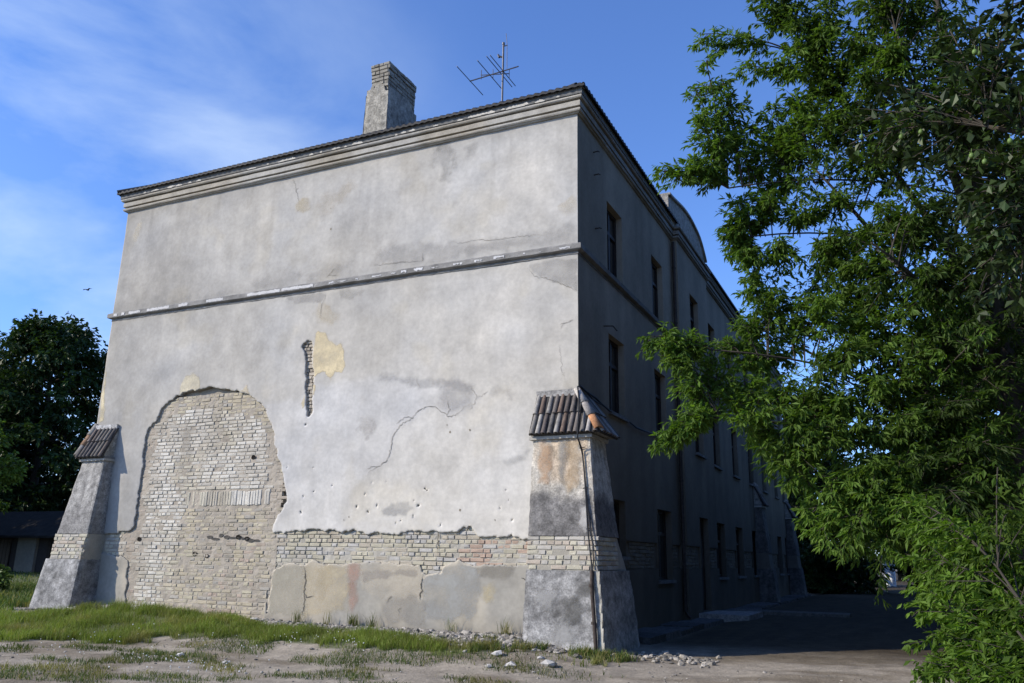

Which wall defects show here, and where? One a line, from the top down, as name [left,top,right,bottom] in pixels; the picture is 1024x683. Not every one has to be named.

peeling [302,331,345,416]
crack [368,383,485,473]
flaking render [103,374,619,653]